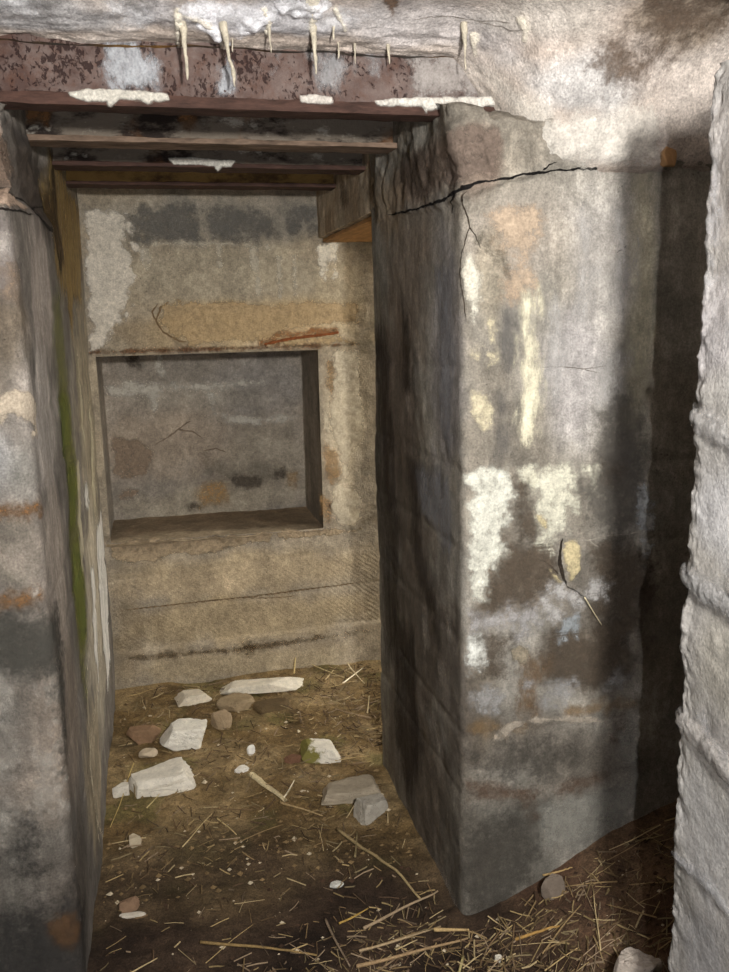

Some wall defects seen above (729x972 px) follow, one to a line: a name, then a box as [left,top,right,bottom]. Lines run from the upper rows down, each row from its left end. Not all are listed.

efflorescence [175,0,349,50]
efflorescence [470,32,478,53]
leakage [592,0,729,82]
efflorescence [69,43,169,106]
efflorescence [300,94,333,104]
crack [0,187,54,233]
crack [389,162,597,322]
peeling [84,209,143,351]
rust [115,327,354,353]
rust [0,503,44,518]
leakage [464,395,654,713]
crack [554,530,647,597]